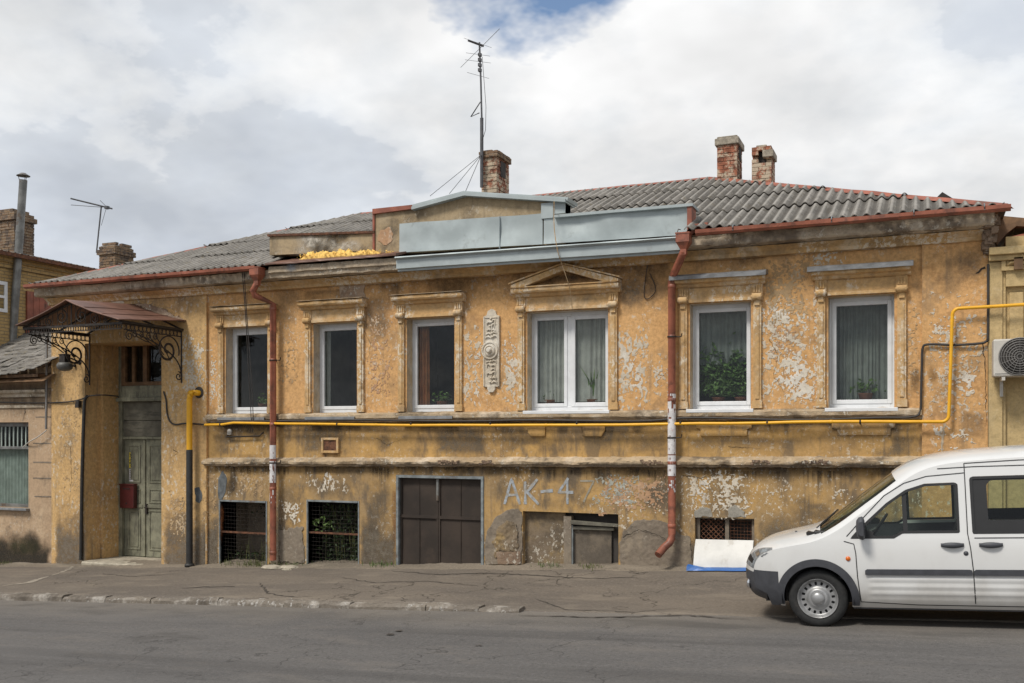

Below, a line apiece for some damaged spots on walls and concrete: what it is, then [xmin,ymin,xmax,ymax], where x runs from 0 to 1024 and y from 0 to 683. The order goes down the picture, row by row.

spalling [378,227,393,245]
peeling [463,325,482,407]
peeling [502,331,518,404]
peeling [618,325,668,410]
peeling [762,252,846,409]
peeling [906,291,988,451]
peeling [279,500,301,525]
peeling [300,472,362,494]
peeling [681,460,789,520]